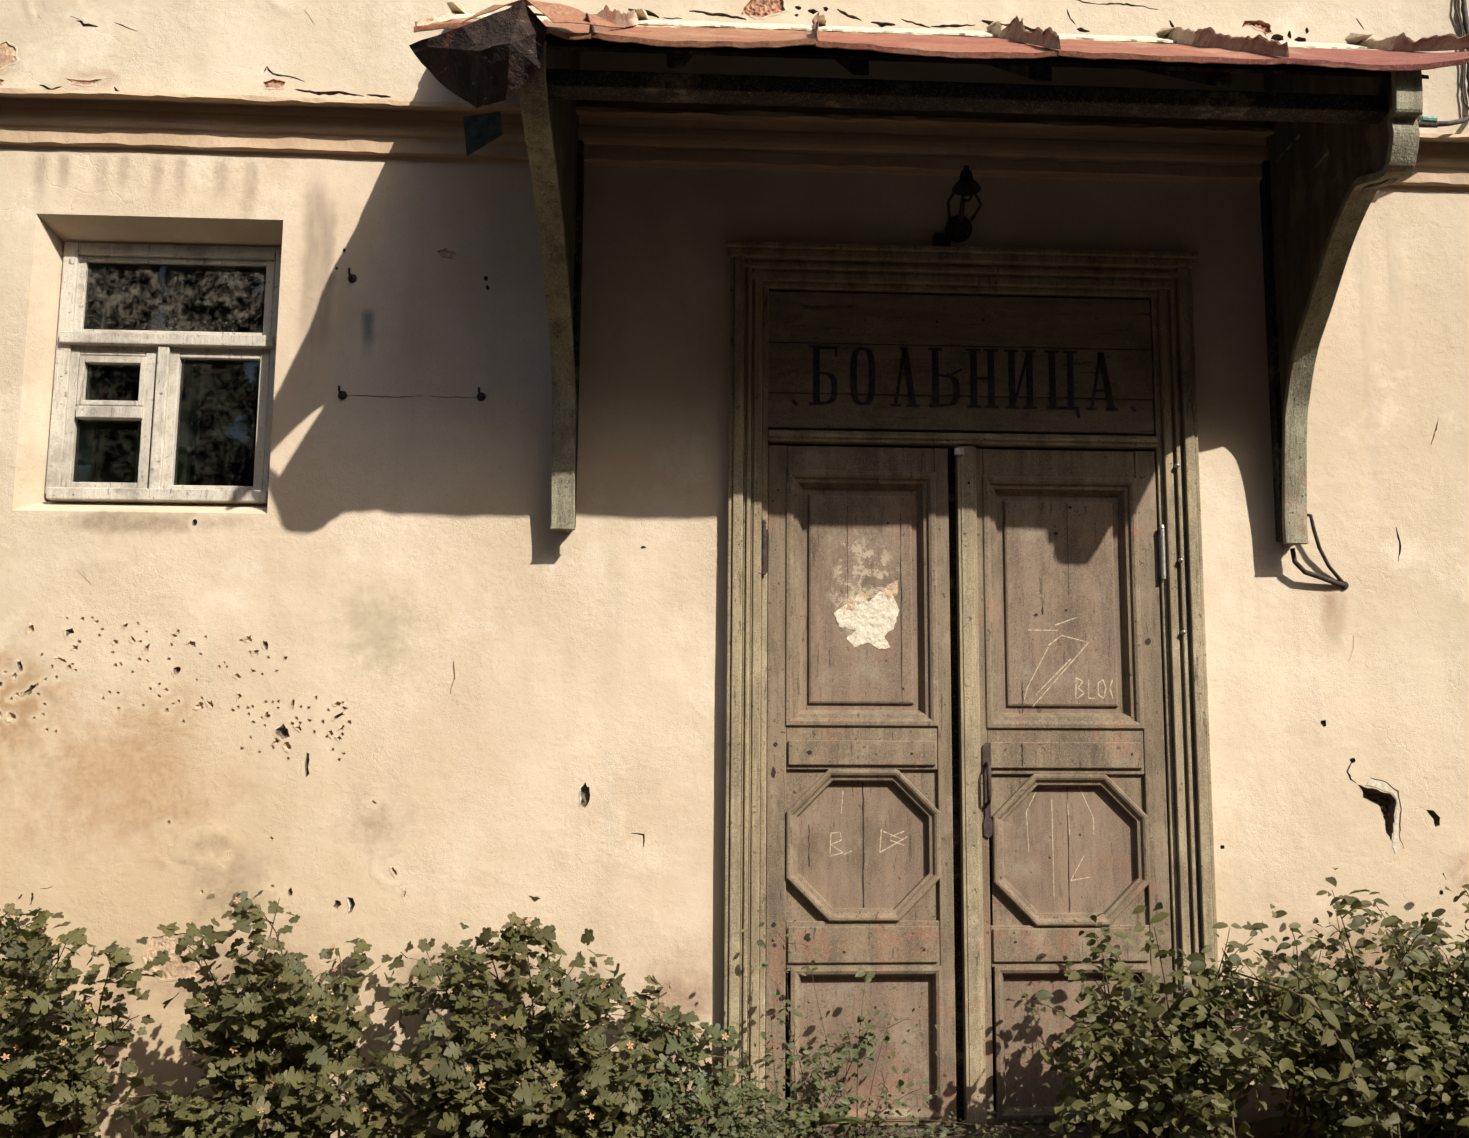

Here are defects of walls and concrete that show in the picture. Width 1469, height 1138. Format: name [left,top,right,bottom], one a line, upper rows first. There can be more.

flaking render [741,0,828,23]
crack [837,9,1035,32]
crack [1067,0,1174,32]
flaking render [0,41,20,85]
flaking render [66,78,104,87]
crack [264,67,390,98]
flaking render [0,616,150,734]
flaking render [142,629,351,762]